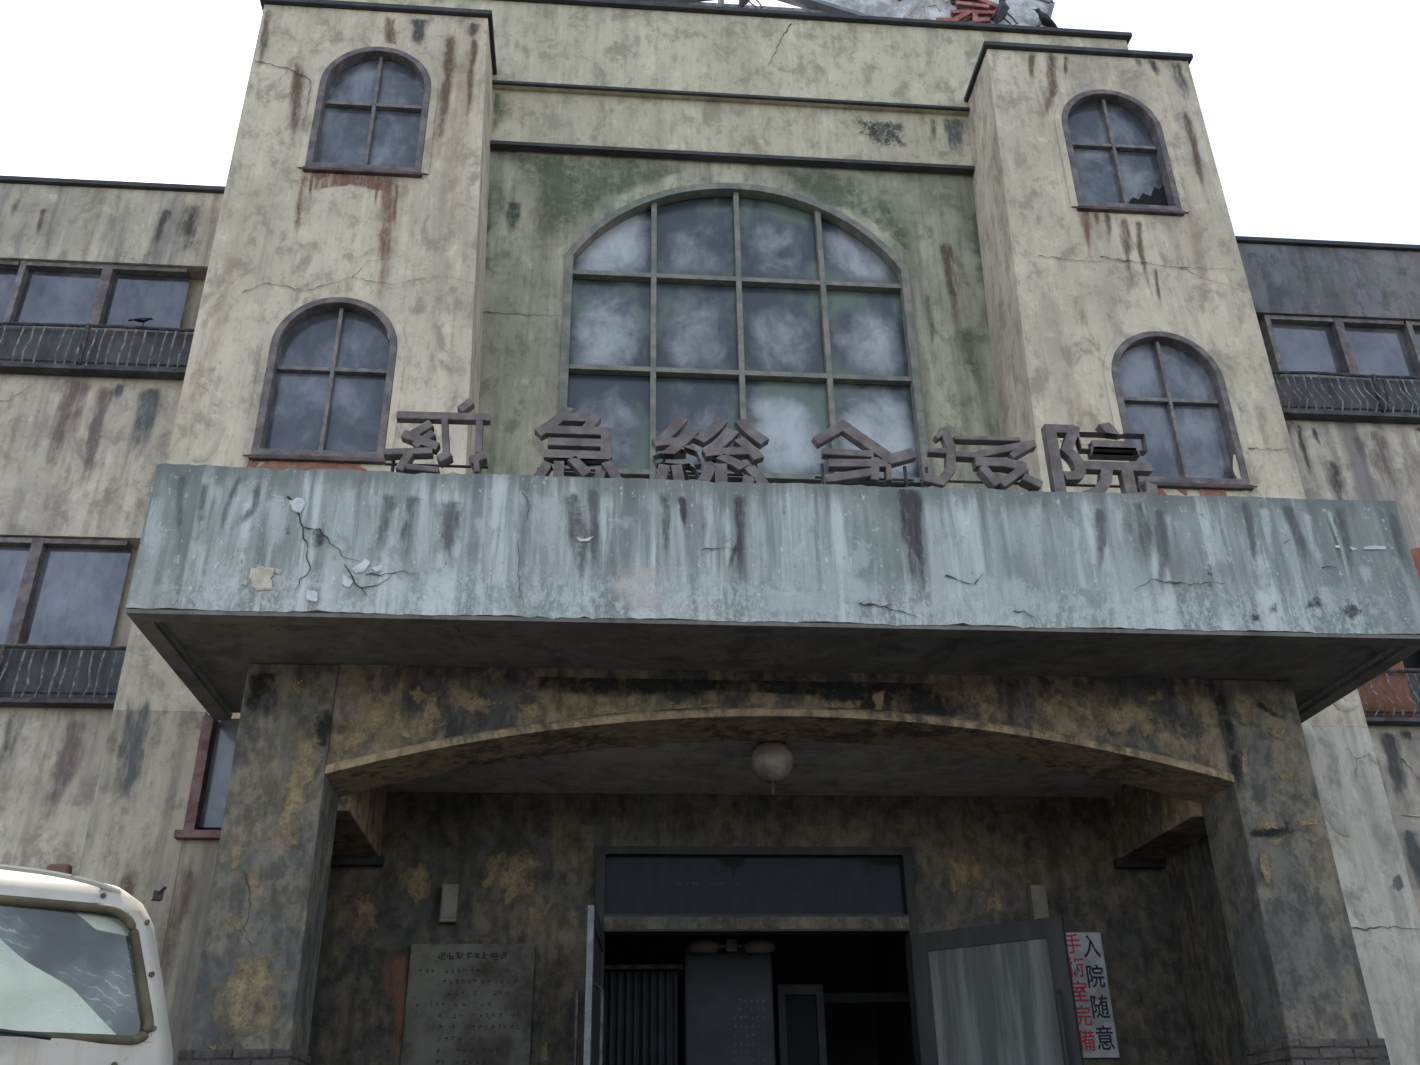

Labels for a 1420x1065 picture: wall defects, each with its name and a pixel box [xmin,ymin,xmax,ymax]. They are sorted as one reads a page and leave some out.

water stain [156,209,196,240]
rust [297,172,398,250]
rust [1082,211,1099,244]
water stain [1286,425,1319,468]
flaking render [242,566,281,591]
crack [287,496,414,595]
water stain [519,492,598,568]
water stain [664,497,686,547]
water stain [731,498,745,562]
water stain [900,489,943,614]
water stain [1243,502,1271,557]
crack [1351,924,1414,932]